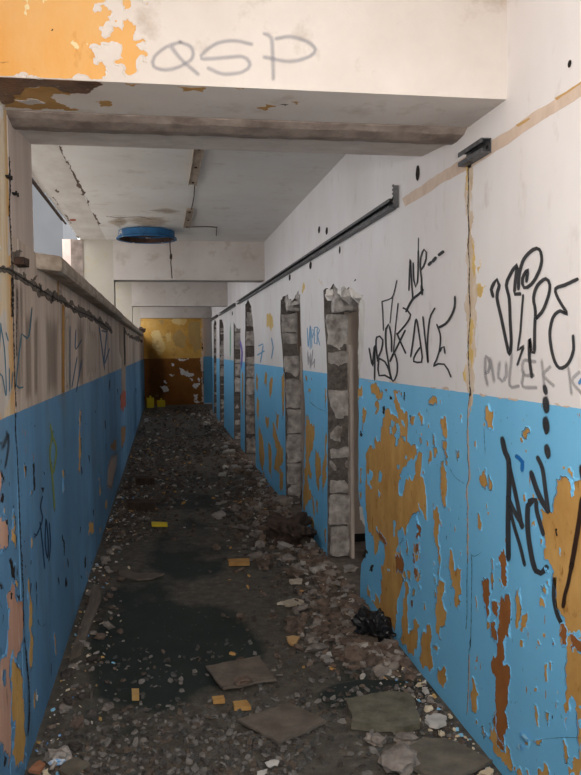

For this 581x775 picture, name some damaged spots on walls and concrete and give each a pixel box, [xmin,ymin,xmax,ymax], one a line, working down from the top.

peeling [0,0,149,119]
peeling [0,470,17,551]
peeling [151,318,224,422]
peeling [234,279,462,690]
crack [450,167,485,712]
peeling [477,466,494,491]
peeling [480,393,494,431]
peeling [520,426,531,452]
peeling [9,576,34,671]
peeling [470,547,552,775]
peeling [523,466,581,775]